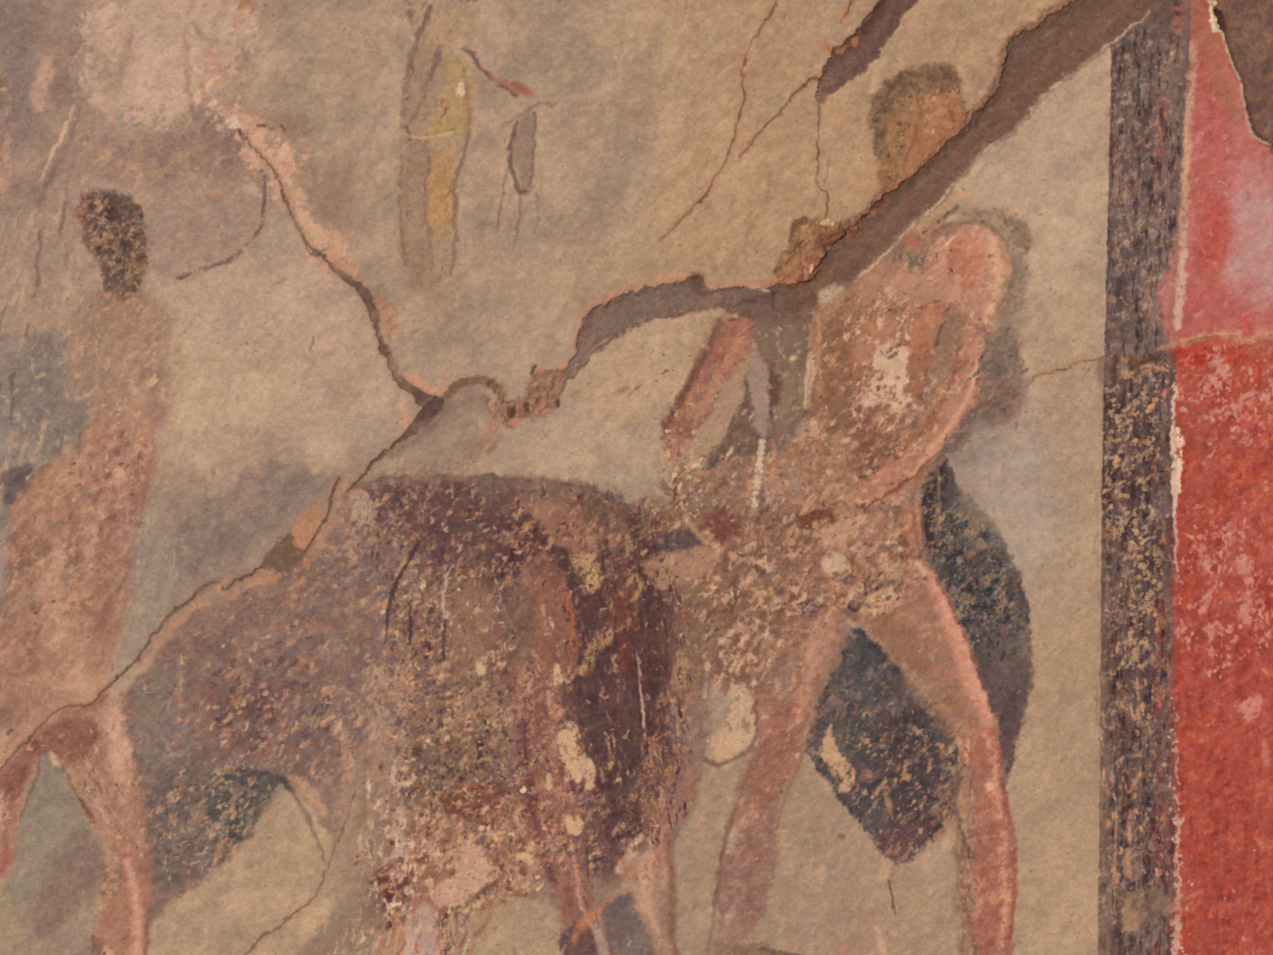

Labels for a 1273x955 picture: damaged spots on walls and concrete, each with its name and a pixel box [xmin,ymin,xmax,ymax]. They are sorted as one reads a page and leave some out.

crack [1208,0,1273,154]
spalling [773,195,890,287]
crack [561,0,1160,384]
crack [220,107,508,559]
spalling [498,370,564,429]
crack [985,335,1273,406]
crack [0,567,262,774]
crack [246,790,357,955]